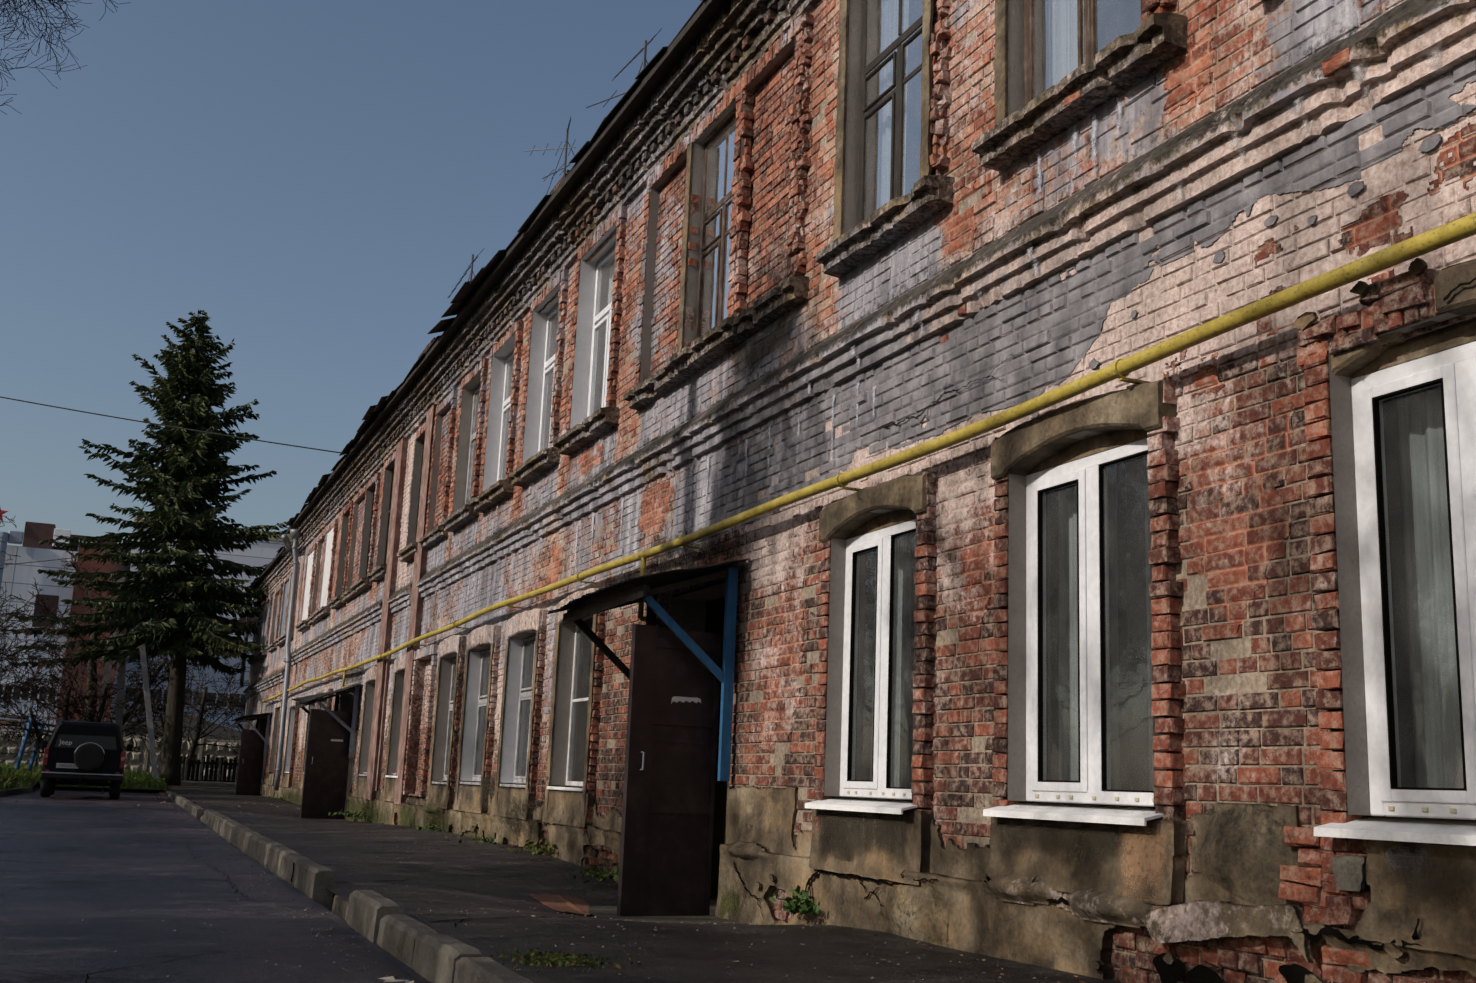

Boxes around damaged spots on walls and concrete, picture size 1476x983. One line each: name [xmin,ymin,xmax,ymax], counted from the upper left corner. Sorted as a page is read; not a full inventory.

peeling [1154,32,1215,115]
spalling [1322,47,1350,77]
peeling [720,57,1476,523]
crack [733,862,937,922]
crack [1032,875,1070,906]
spalling [1090,826,1476,983]
crack [1292,918,1457,956]